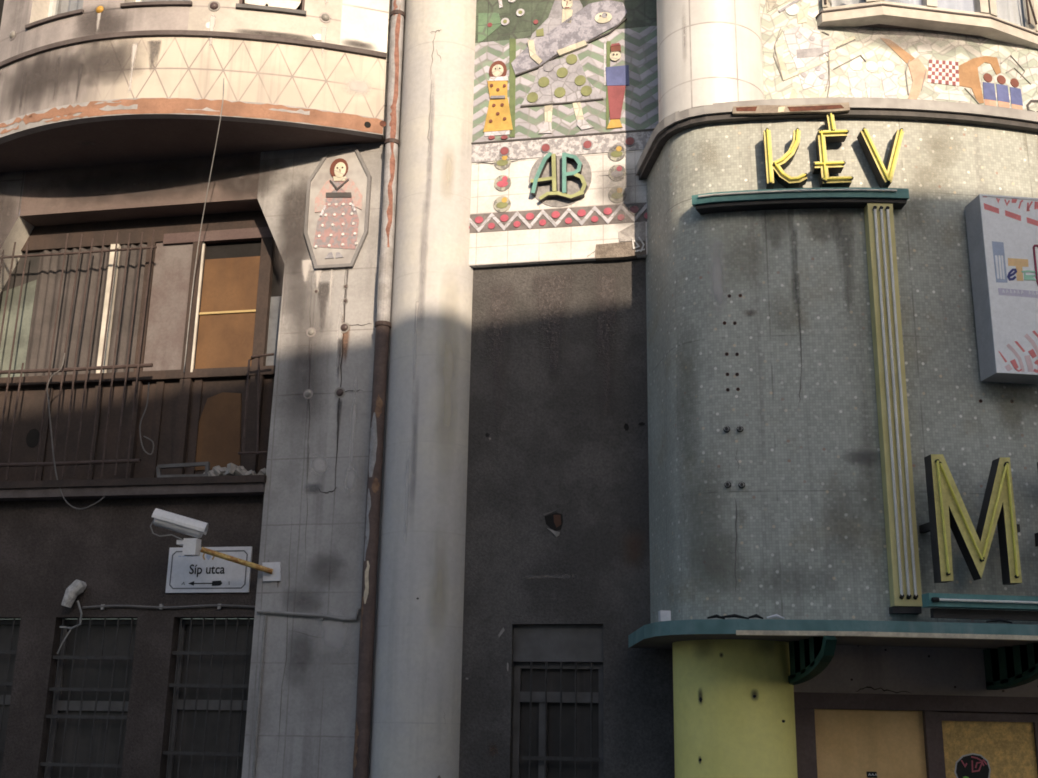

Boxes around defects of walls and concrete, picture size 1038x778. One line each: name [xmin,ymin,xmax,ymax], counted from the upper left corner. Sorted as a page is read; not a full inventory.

leakage [129,41,160,89]
crack [427,30,441,150]
peeling [0,98,386,134]
corrosion [386,0,401,247]
hole [543,511,563,537]